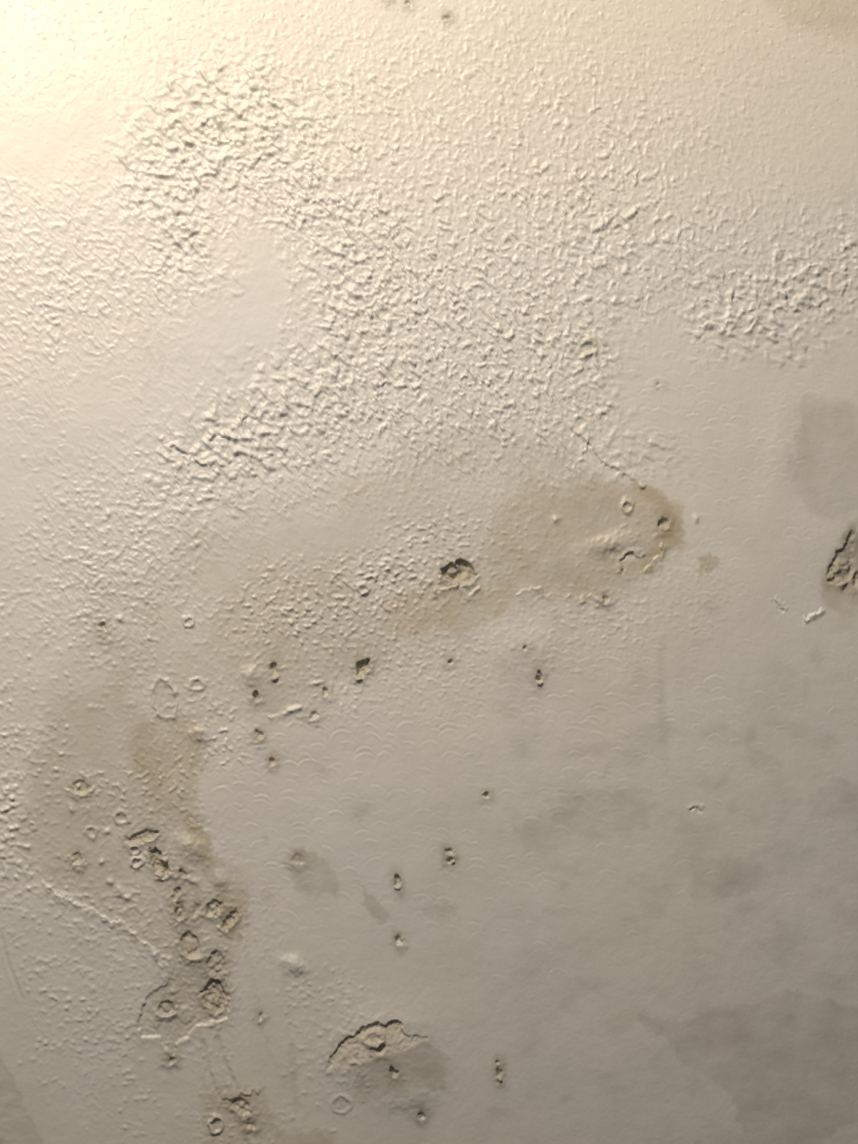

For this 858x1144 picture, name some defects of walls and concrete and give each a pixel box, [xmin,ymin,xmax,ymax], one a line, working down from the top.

peeling [407,555,491,606]
peeling [794,523,858,627]
leakage [0,402,723,1051]
peeling [31,825,243,1058]
peeling [321,1015,435,1076]
peeling [211,1082,271,1121]